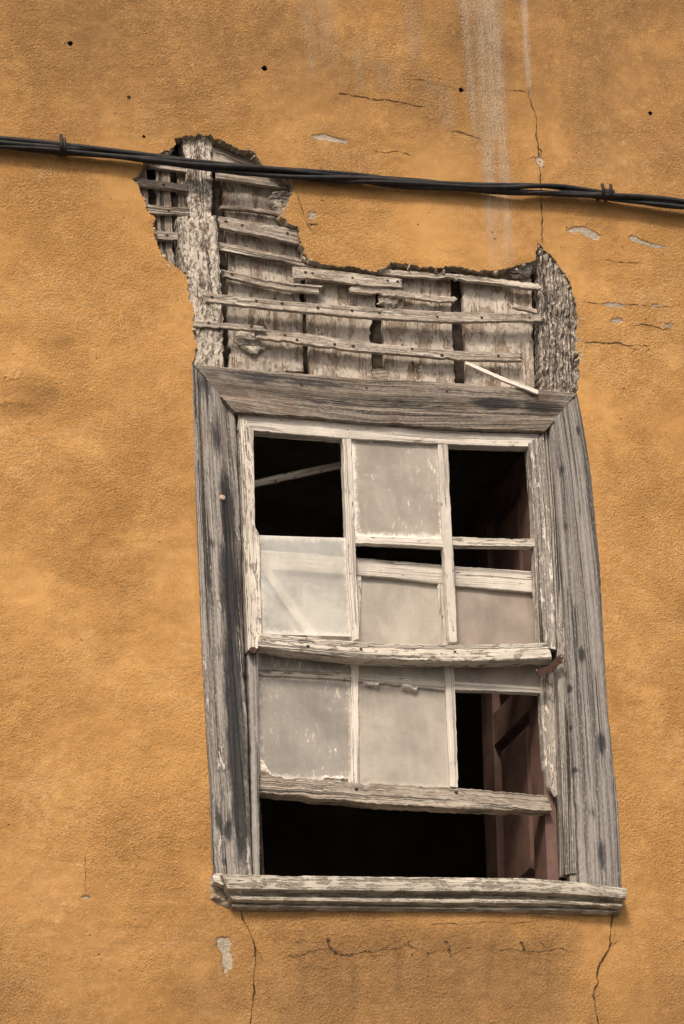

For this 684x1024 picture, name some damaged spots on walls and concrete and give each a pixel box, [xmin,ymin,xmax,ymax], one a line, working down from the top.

flaking render [159,133,265,166]
peeling [313,134,347,144]
crack [338,30,543,242]
peeling [567,227,600,240]
peeling [629,235,666,249]
flaking render [267,178,584,391]
peeling [216,937,233,974]
crack [240,910,567,1024]
crack [592,915,619,1024]